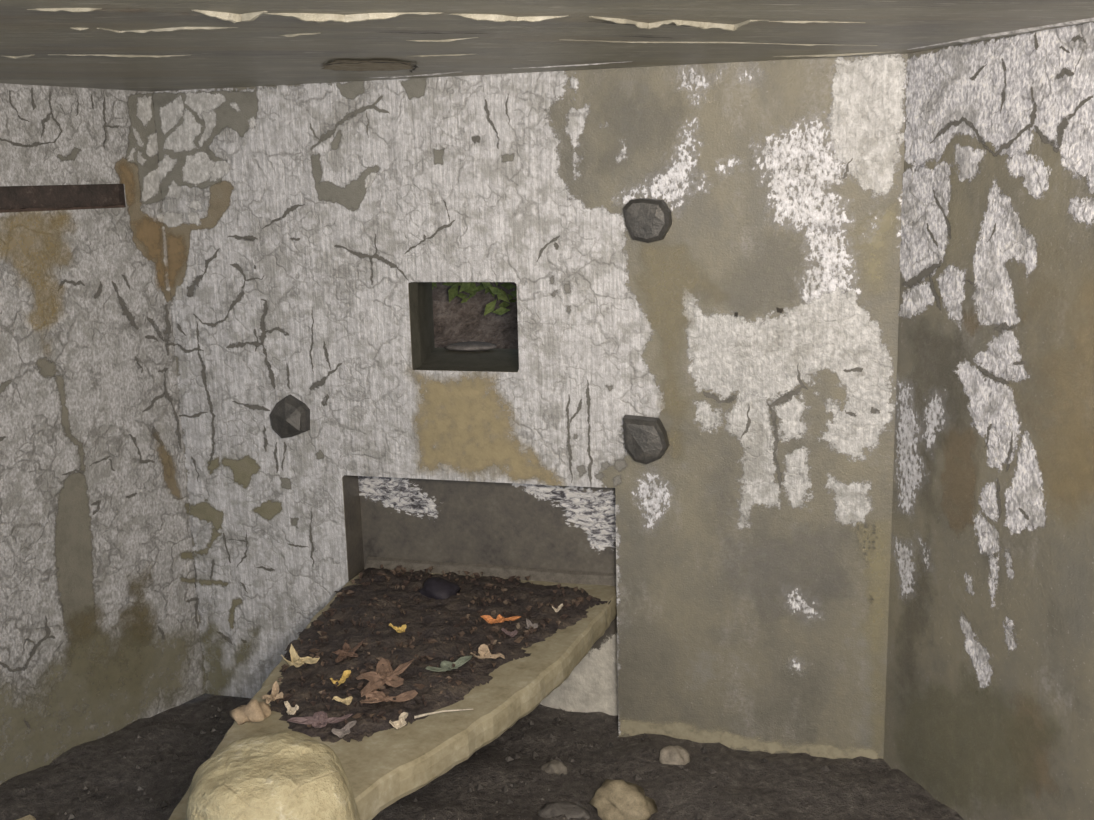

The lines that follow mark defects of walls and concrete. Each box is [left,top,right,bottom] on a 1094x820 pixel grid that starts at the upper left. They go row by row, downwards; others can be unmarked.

crack [0,88,119,149]
crack [471,94,510,149]
rust [0,164,135,213]
rust [133,218,186,287]
crack [334,200,455,285]
crack [58,204,342,482]
peeling [682,22,1094,607]
peeling [115,68,741,735]
crack [566,380,593,489]
peeling [788,588,819,618]
water stain [200,624,258,696]
peeling [959,615,993,688]